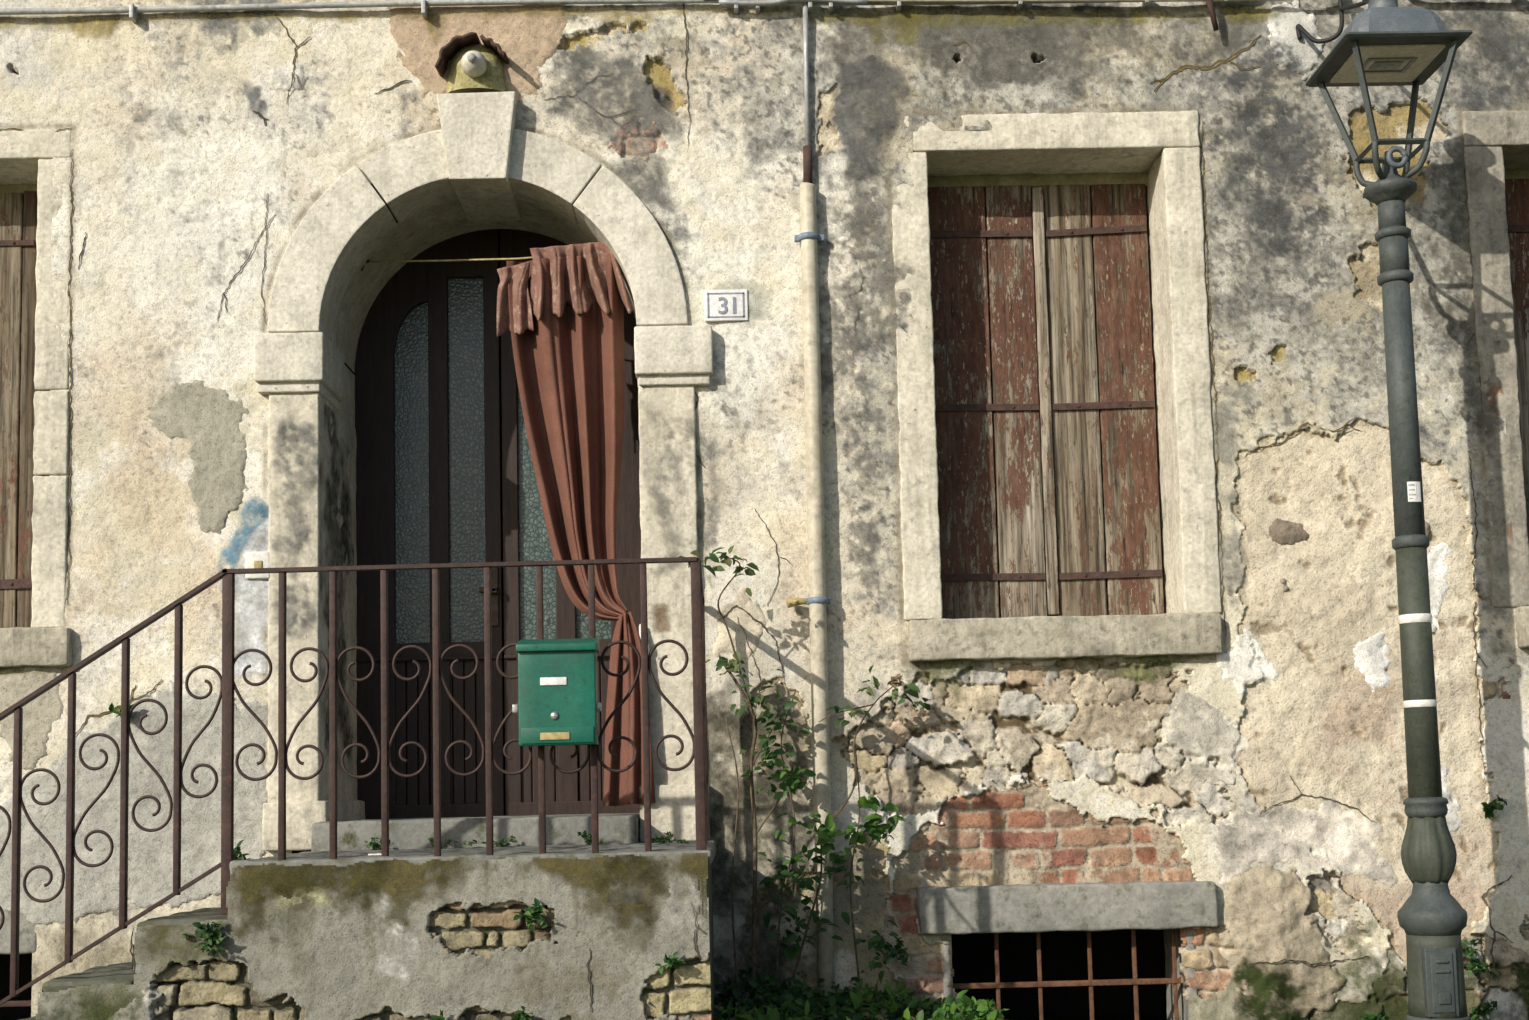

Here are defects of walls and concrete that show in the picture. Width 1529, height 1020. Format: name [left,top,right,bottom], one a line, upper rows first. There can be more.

flaking render [607,58,686,162]
crack [1150,34,1261,92]
peeling [1342,98,1448,210]
crack [217,193,276,324]
peeling [1231,419,1413,963]
peeling [1421,459,1511,940]
flaking render [152,958,305,1020]
flaking render [357,1006,436,1020]
flaking render [459,1006,518,1020]
flaking render [429,900,557,957]
flaking render [742,776,1194,1019]
flaking render [1179,926,1231,1000]